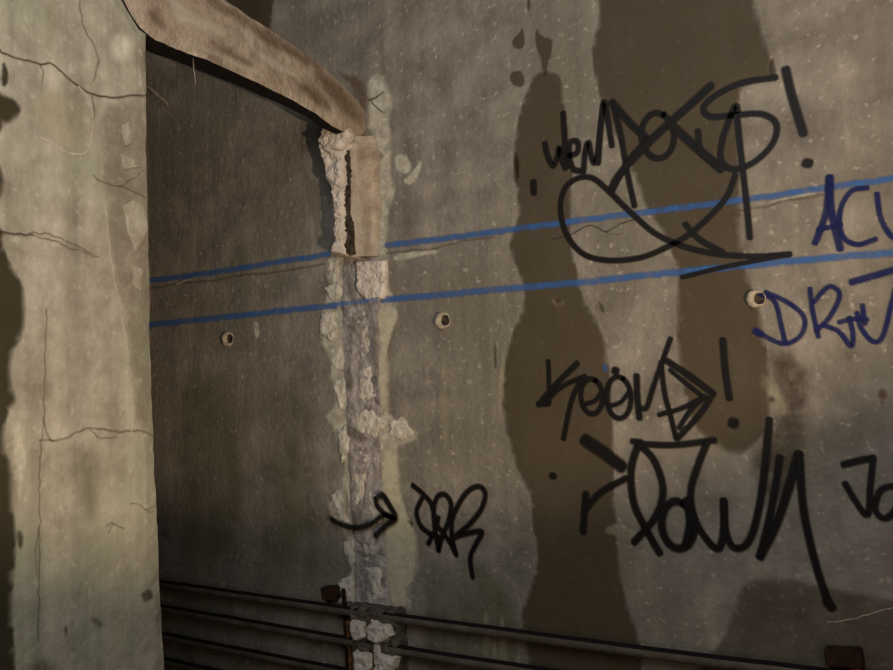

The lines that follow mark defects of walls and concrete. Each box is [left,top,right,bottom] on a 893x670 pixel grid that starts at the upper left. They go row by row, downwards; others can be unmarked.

crack [0,49,147,98]
crack [0,231,49,240]
leakage [495,30,638,645]
spalling [318,72,422,670]
leakage [528,642,641,670]